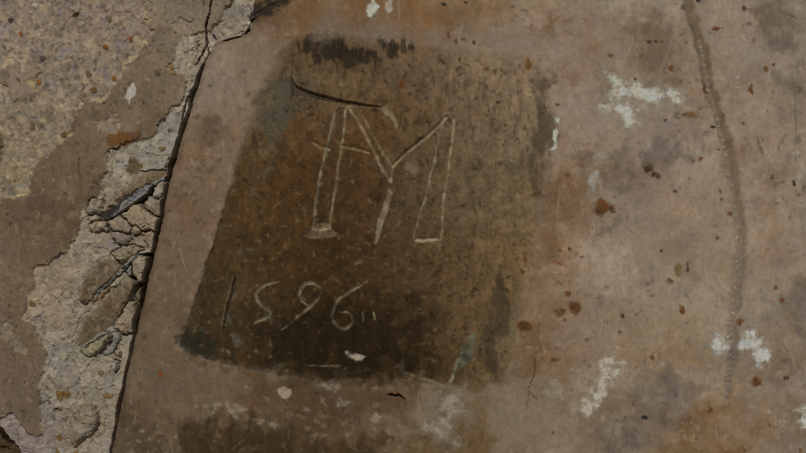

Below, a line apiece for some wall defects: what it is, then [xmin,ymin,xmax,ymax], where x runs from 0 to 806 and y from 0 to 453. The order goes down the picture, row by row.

crack [197,0,254,63]
leakage [297,32,414,68]
crack [181,92,196,128]
leakage [599,73,684,129]
spalling [0,0,255,453]
corrosion [595,199,613,216]
leakage [684,0,771,368]
leakage [574,356,627,417]
crack [69,404,101,449]
leakage [796,406,806,428]